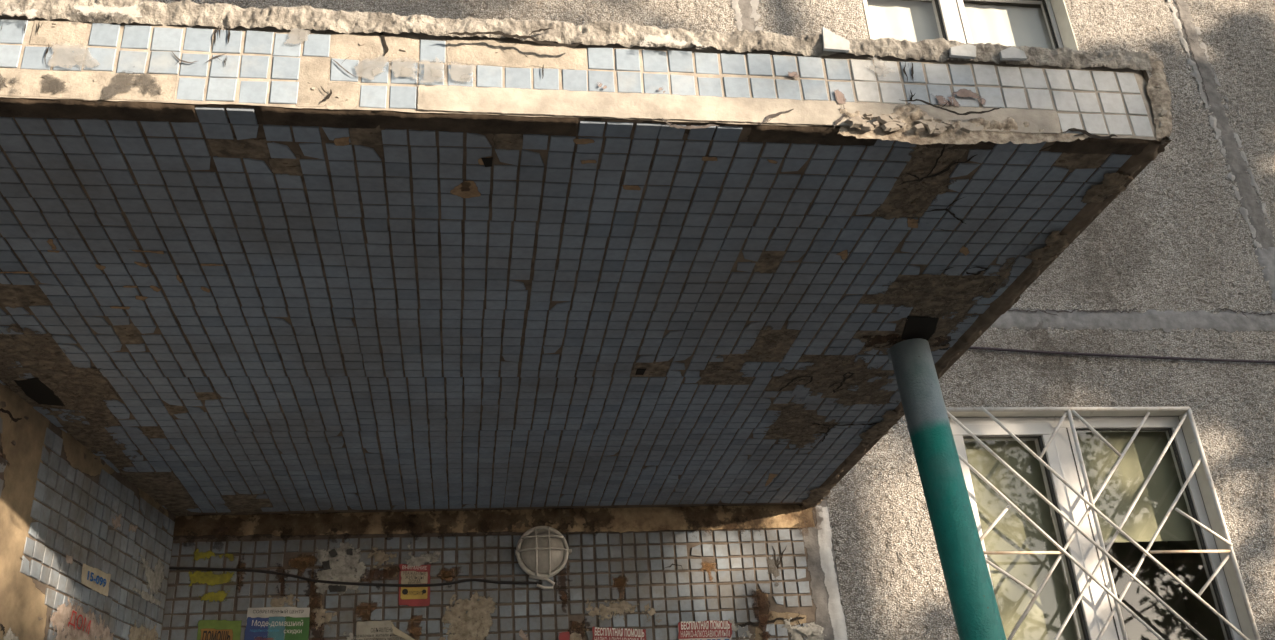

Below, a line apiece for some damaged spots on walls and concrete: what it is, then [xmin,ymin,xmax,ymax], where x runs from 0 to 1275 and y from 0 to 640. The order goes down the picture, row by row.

peeling [0,68,177,102]
crack [901,62,1002,115]
peeling [207,136,304,176]
peeling [296,29,1134,228]
crack [897,145,978,232]
peeling [0,271,52,309]
peeling [110,285,161,345]
peeling [697,230,1071,450]
peeling [140,391,218,439]
peeling [0,324,198,640]